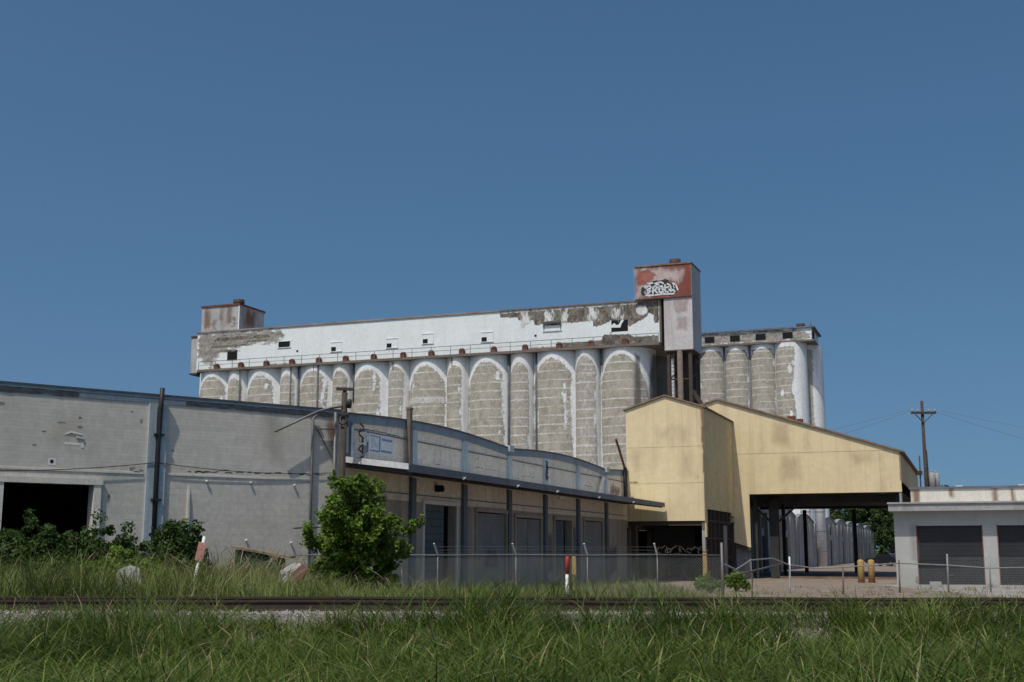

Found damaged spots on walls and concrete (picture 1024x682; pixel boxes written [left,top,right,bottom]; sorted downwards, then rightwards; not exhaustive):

peeling [186,267,685,493]
peeling [696,346,815,426]